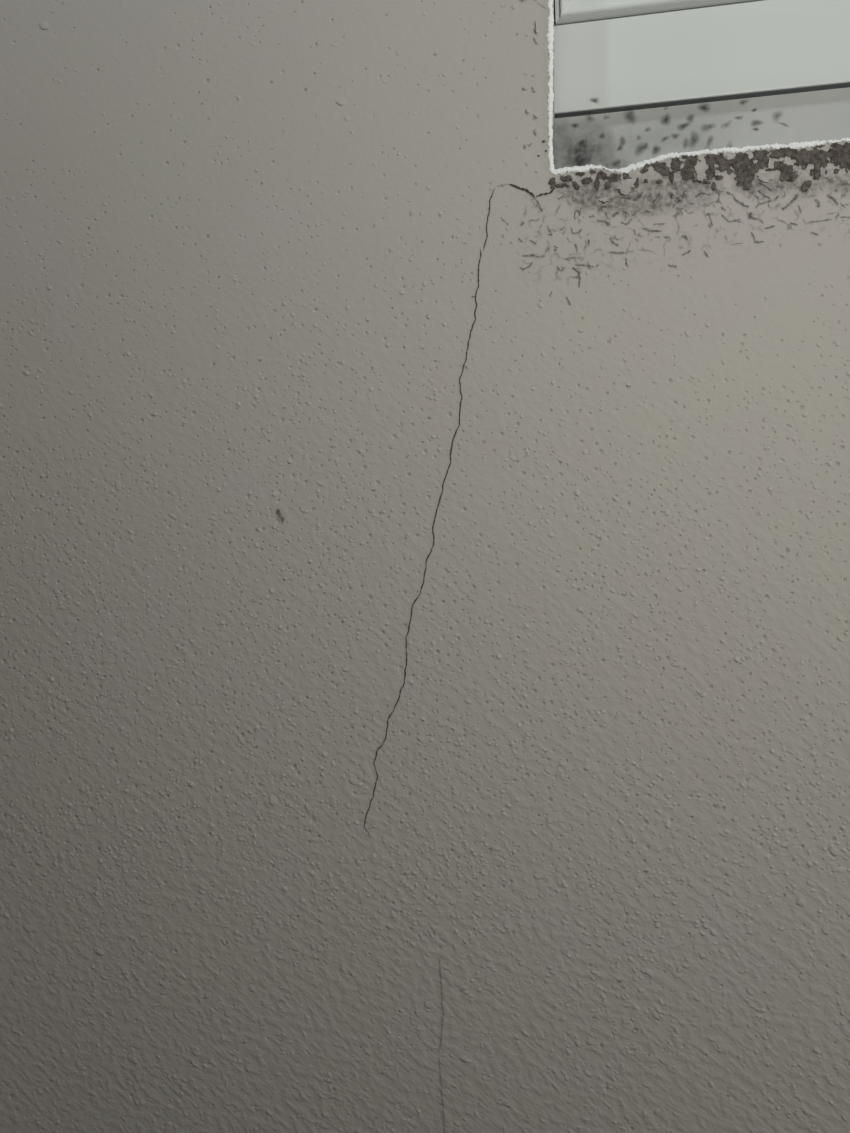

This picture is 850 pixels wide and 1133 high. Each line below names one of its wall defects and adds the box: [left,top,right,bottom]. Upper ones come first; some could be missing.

crack [364,183,844,832]